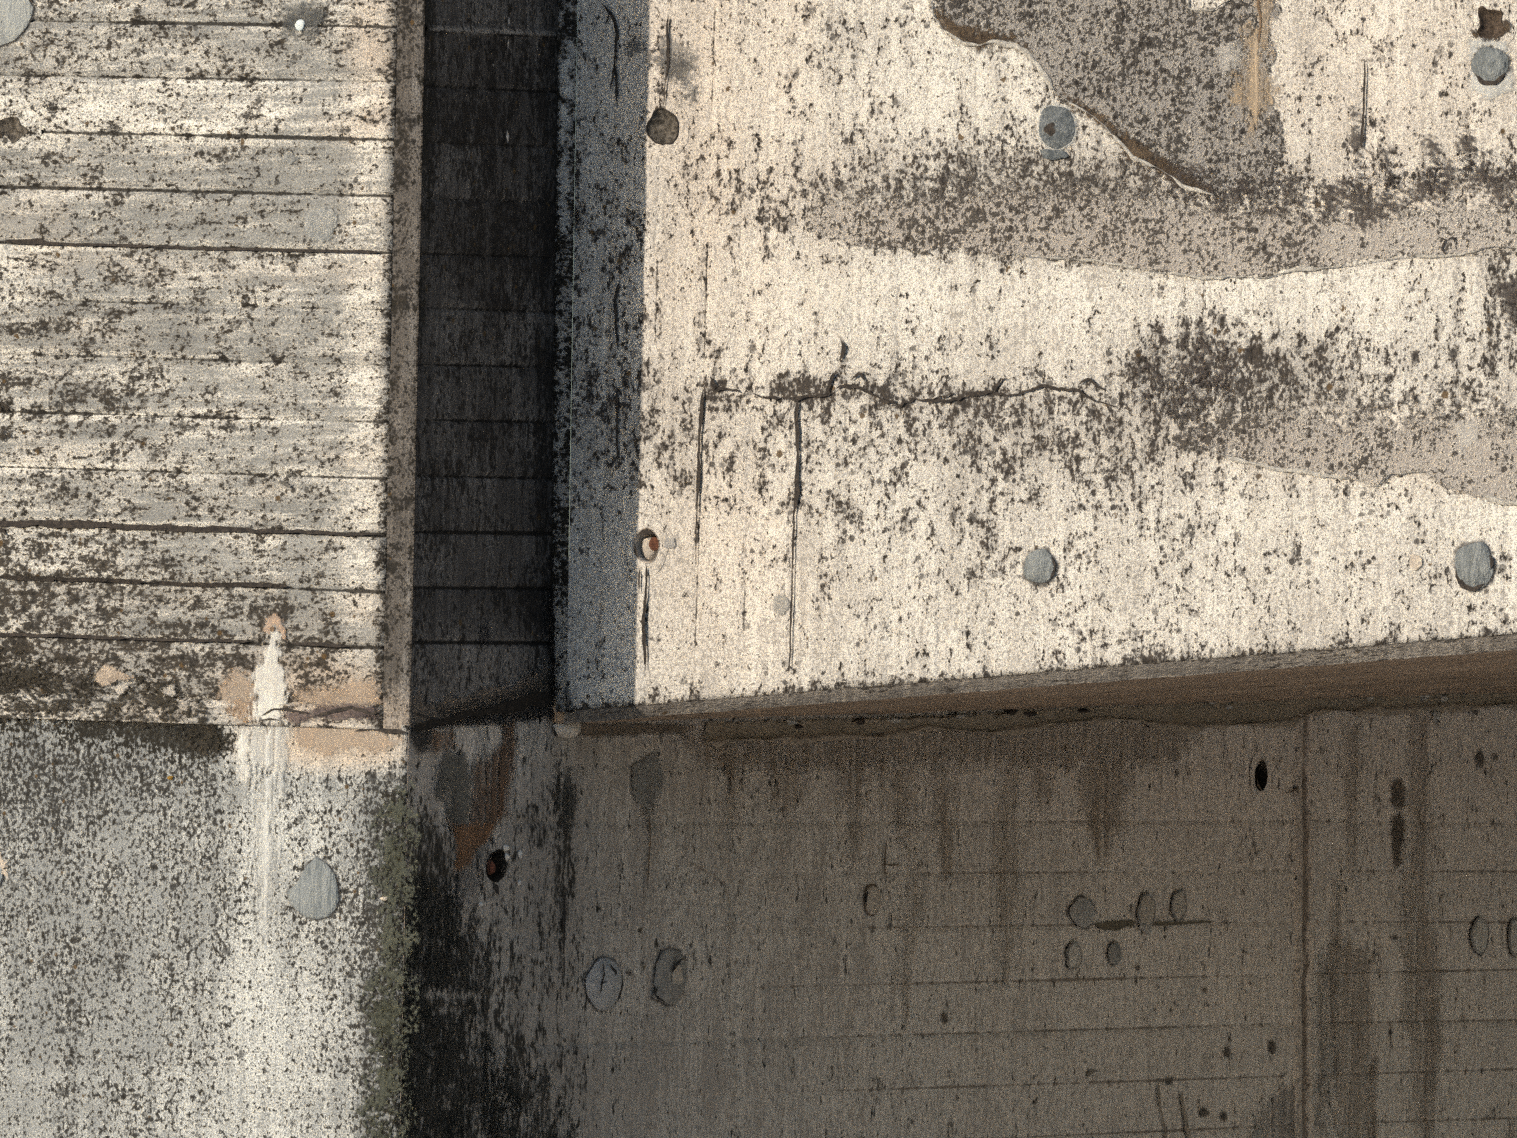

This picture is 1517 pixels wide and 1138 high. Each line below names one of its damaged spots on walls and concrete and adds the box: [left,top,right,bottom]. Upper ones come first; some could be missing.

spalling [636,95,689,156]
spalling [797,0,1517,280]
spalling [1145,374,1517,506]
peeling [95,664,134,694]
corrosion [449,721,514,903]
leakage [553,767,579,837]
leakage [1392,715,1428,877]
leakage [381,878,576,1138]